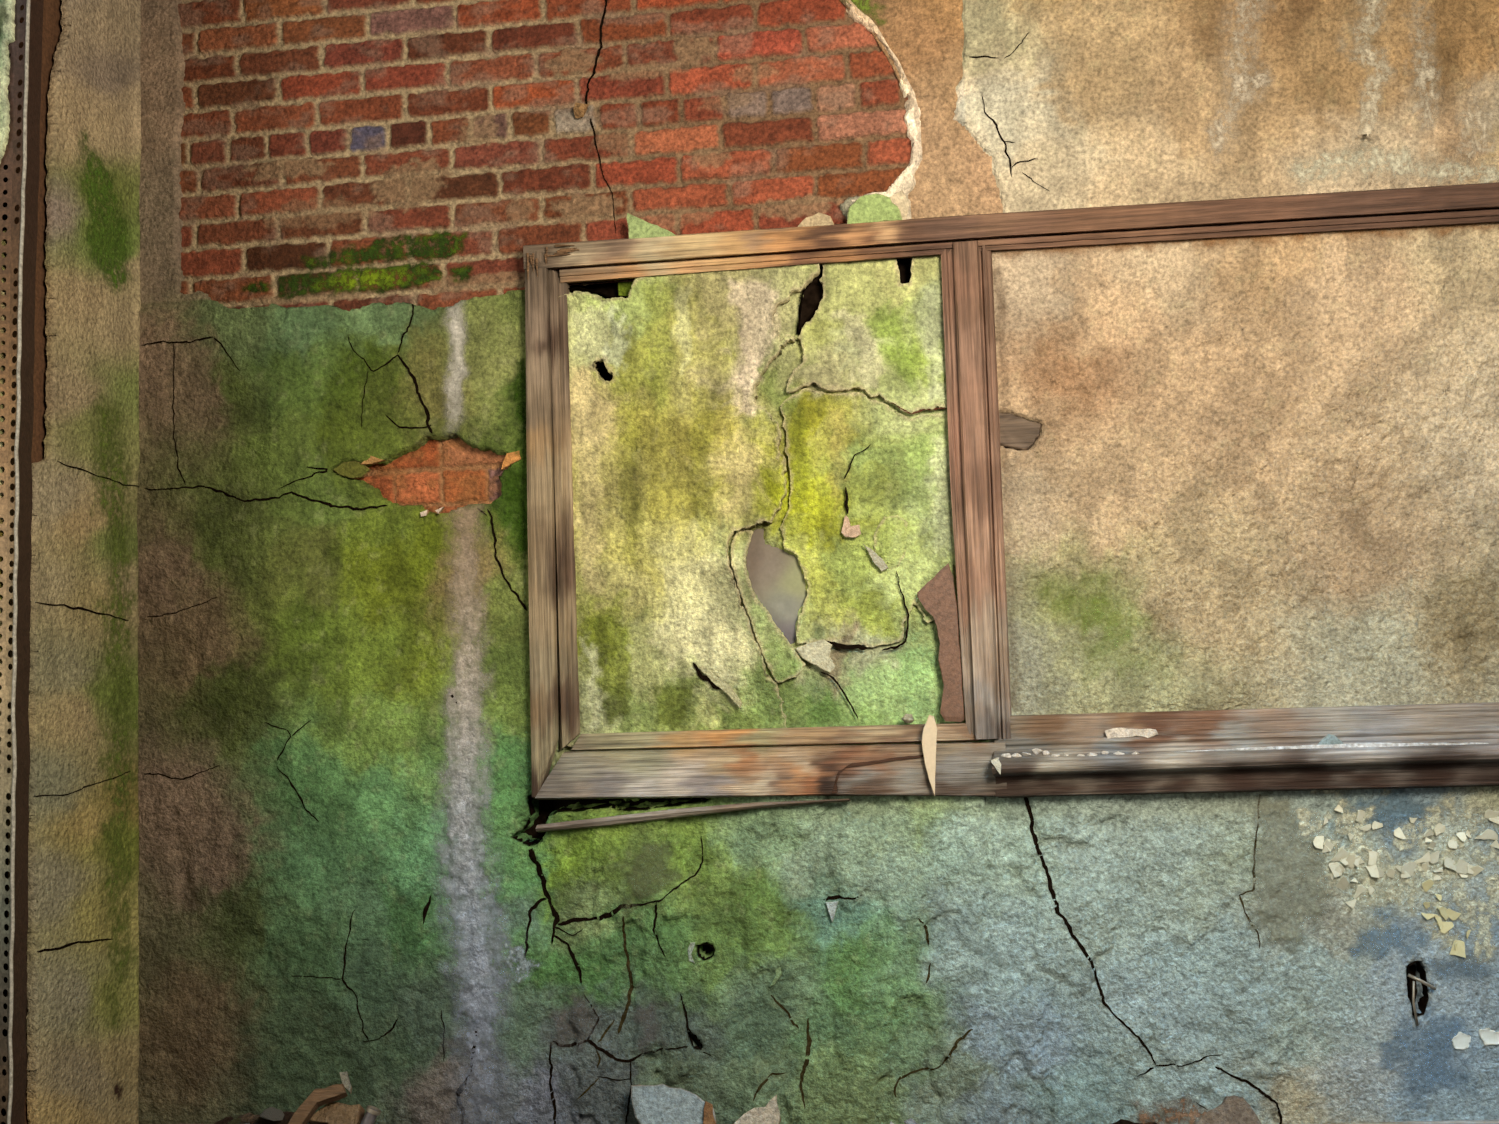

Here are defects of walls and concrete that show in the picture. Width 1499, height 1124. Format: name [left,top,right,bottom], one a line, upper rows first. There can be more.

spalling [178,0,1003,311]
crack [585,0,616,229]
crack [58,337,387,511]
crack [348,303,432,433]
leakage [446,305,465,416]
peeling [557,241,958,747]
leakage [438,506,539,1124]
crack [524,838,713,1124]
crack [753,995,812,1108]
crack [1024,797,1282,1124]
peeling [1296,787,1499,959]
peeling [1452,1028,1499,1050]